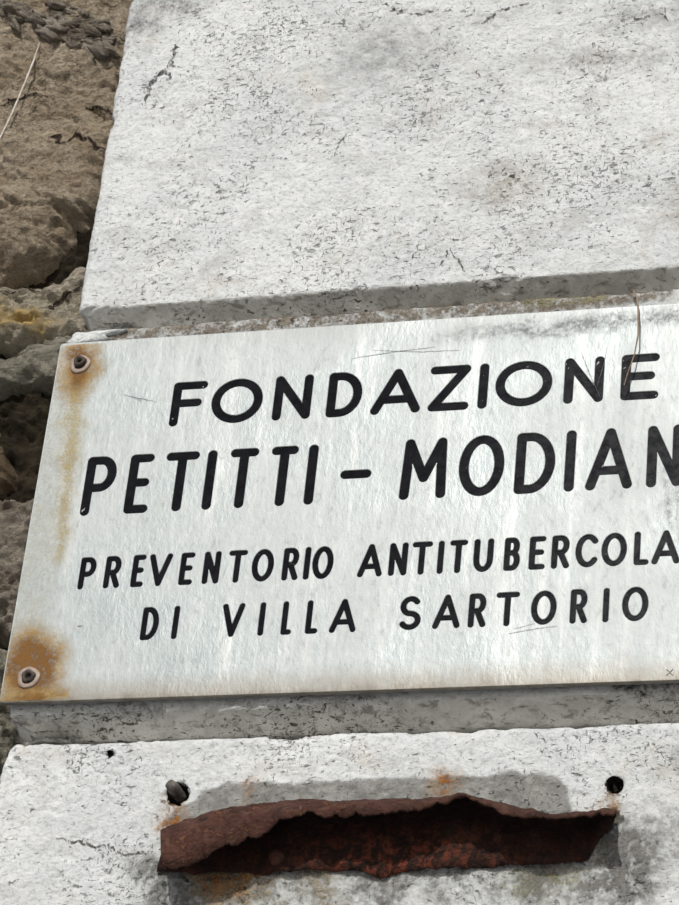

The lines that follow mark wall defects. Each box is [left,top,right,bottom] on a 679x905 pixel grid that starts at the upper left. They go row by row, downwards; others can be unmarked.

corrosion [56,344,103,558]
corrosion [1,629,68,701]